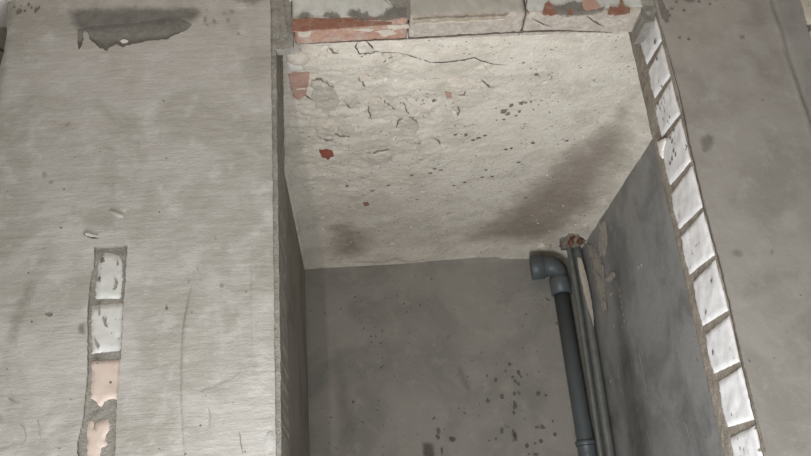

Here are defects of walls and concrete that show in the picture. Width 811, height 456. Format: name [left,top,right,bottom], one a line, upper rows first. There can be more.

damp [74,9,197,28]
spalling [292,0,508,37]
crack [295,0,610,65]
spalling [542,1,557,16]
spalling [567,0,630,16]
damp [495,144,607,236]
flaking render [78,231,128,456]